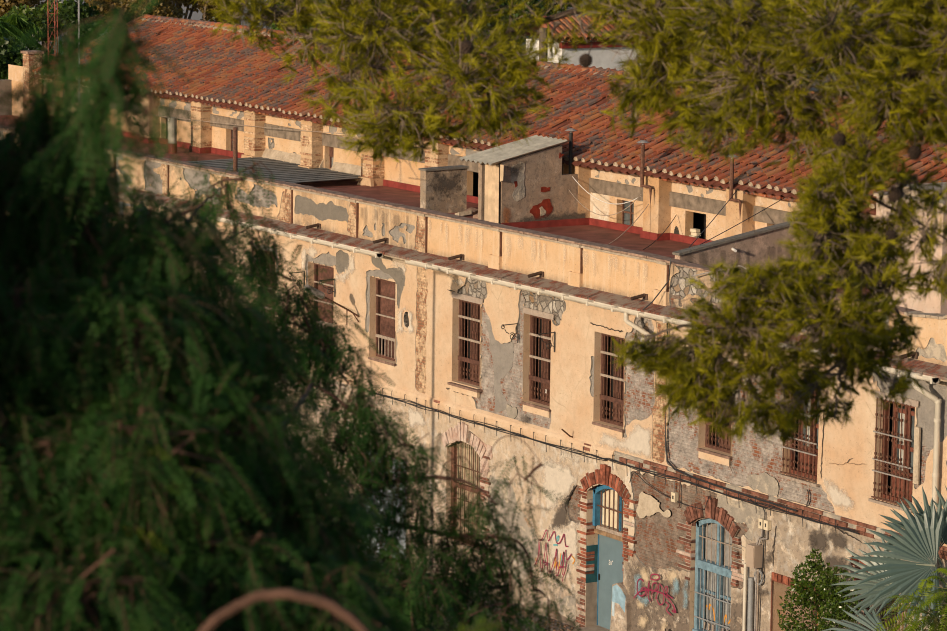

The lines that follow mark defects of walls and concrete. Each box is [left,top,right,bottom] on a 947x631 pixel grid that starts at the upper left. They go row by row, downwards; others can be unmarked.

flaking render [362,215,419,250]
flaking render [530,187,553,219]
flaking render [457,278,566,429]
flaking render [916,338,947,362]
flaking render [623,316,835,513]
flaking render [630,471,717,582]